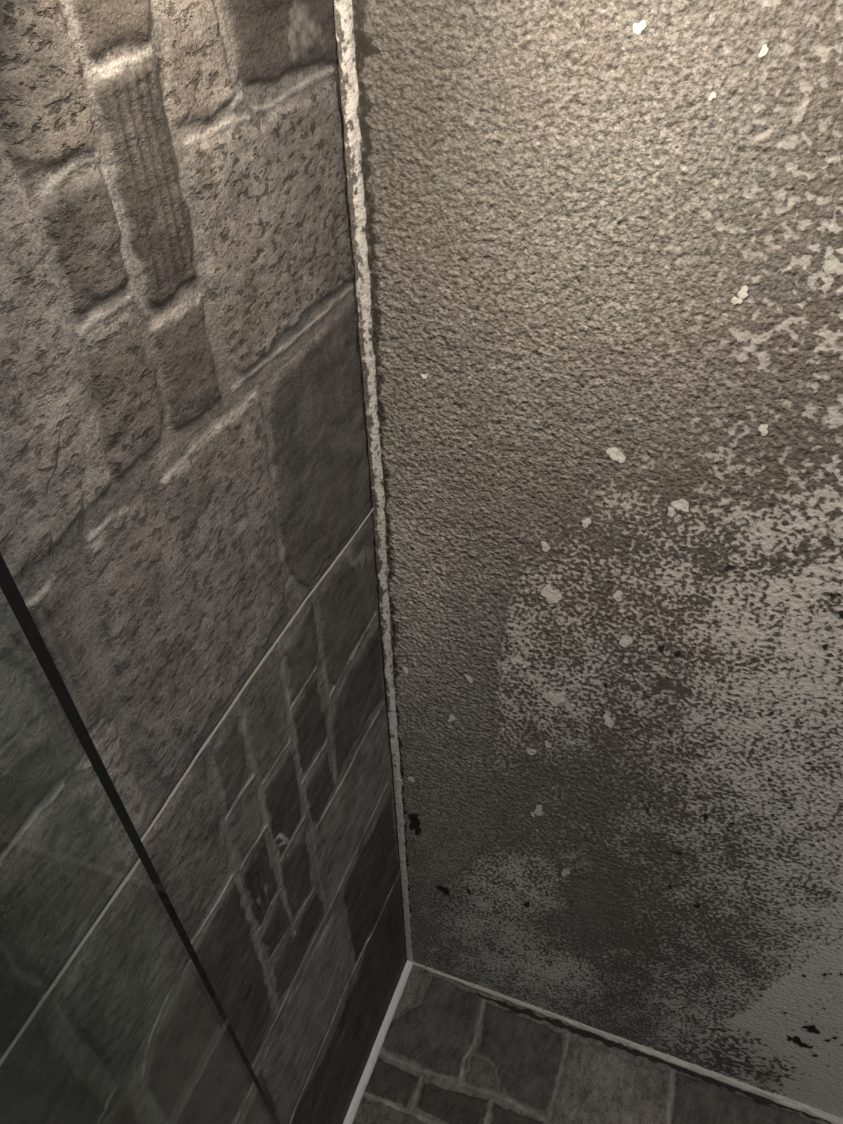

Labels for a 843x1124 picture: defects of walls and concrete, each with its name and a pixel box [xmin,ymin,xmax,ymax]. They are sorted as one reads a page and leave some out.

water stain [349,0,843,1123]